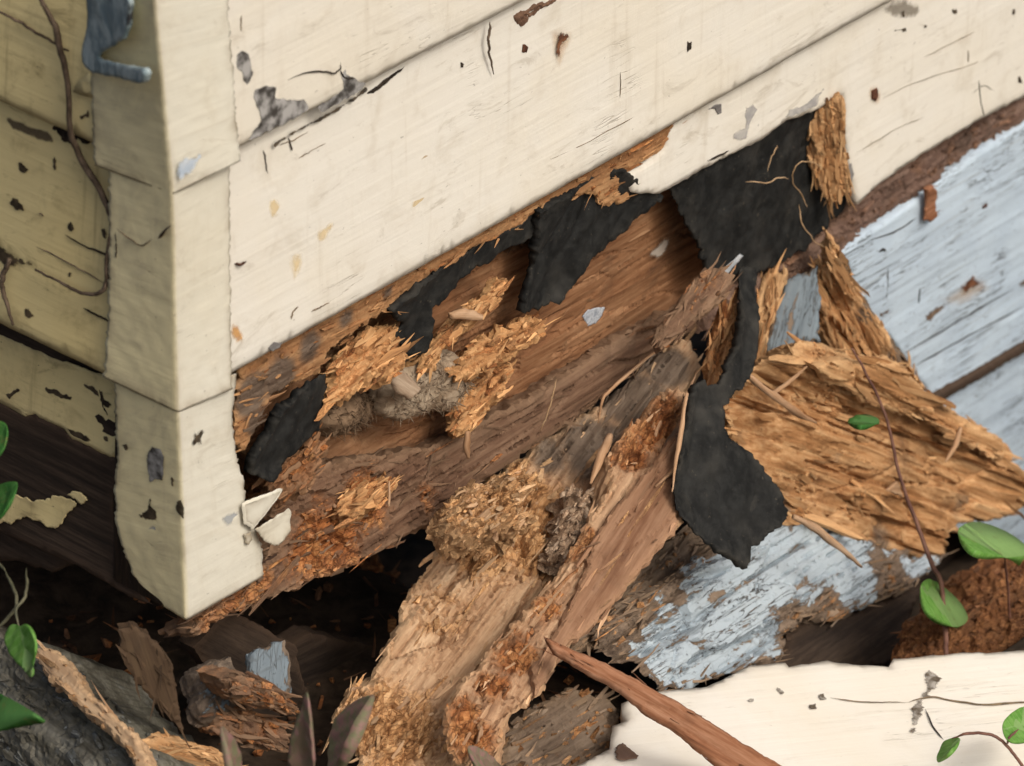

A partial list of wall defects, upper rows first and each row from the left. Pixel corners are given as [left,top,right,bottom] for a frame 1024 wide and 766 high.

peeling [237,51,368,147]
spalling [0,247,31,266]
peeling [0,389,153,605]
peeling [139,499,157,520]
peeling [147,447,174,486]
peeling [176,500,184,519]
peeling [242,488,291,546]
spalling [580,549,712,673]
spalling [659,535,931,691]
peeling [910,670,943,739]